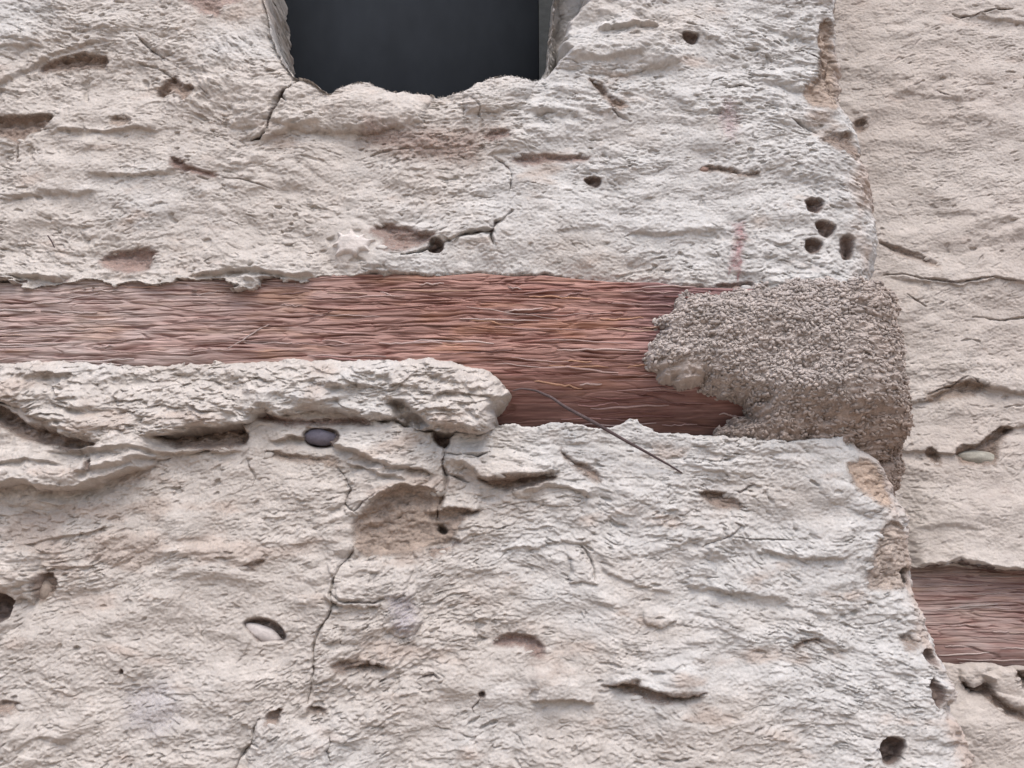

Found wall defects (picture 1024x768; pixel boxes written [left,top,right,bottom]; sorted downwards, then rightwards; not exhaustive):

crack [252,84,292,141]
crack [415,156,512,253]